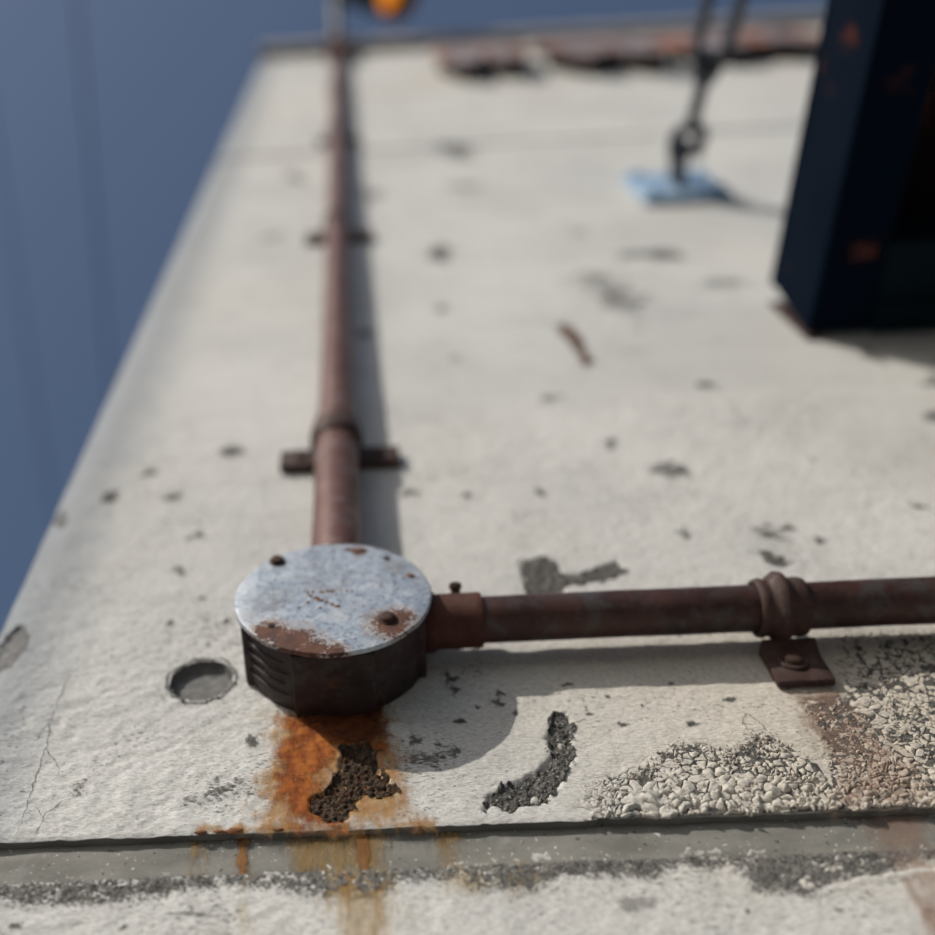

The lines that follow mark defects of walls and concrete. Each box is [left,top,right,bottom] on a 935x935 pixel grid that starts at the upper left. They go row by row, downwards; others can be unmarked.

spalling [521,556,628,594]
crack [18,669,75,833]
corrosion [259,706,432,893]
spalling [310,740,401,823]
peeling [397,733,465,772]
spalling [475,690,518,717]
spalling [482,711,577,813]
peeling [564,625,935,820]
corrosion [192,823,250,875]